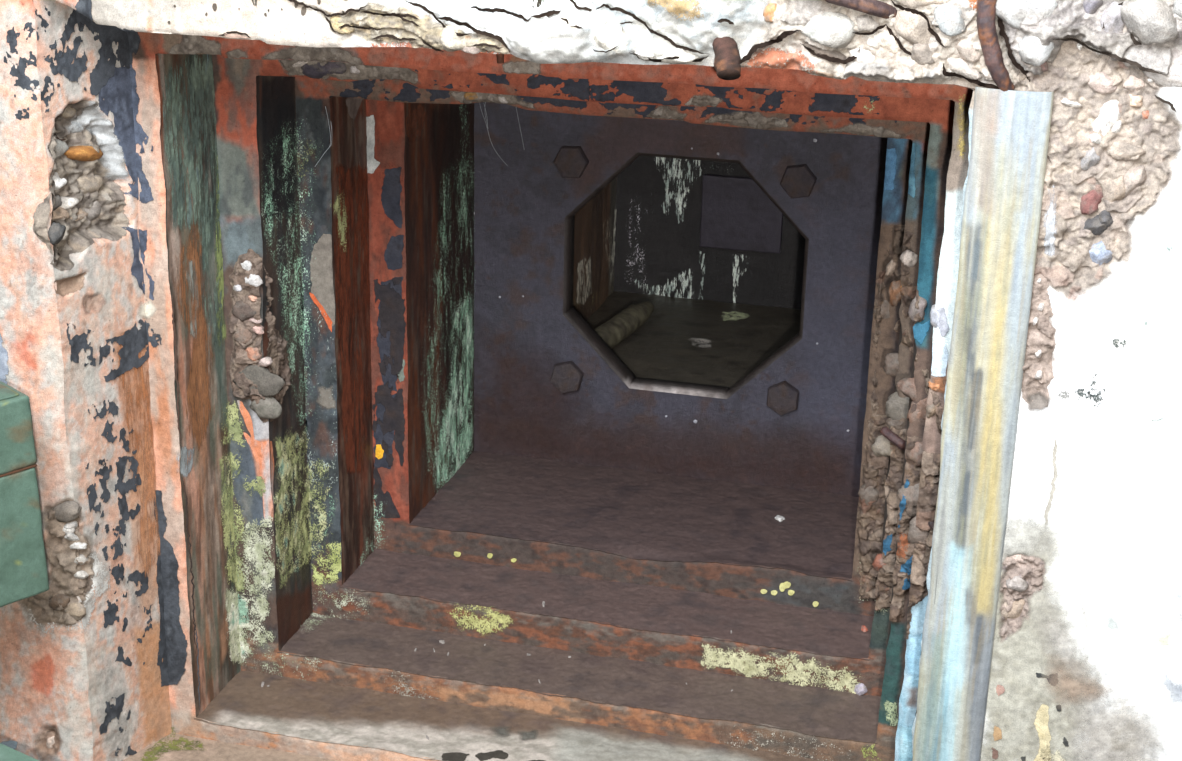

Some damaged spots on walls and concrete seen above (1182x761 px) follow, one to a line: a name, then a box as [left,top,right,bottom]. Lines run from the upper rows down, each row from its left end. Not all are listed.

spalling [4,0,154,300]
spalling [20,400,188,687]
corrosion [119,334,160,573]
corrosion [174,225,214,451]
peeling [169,35,248,59]
crack [219,30,250,38]
spalling [228,249,291,519]
spalling [263,0,1182,411]
spalling [856,224,944,639]
leakage [980,515,1146,761]